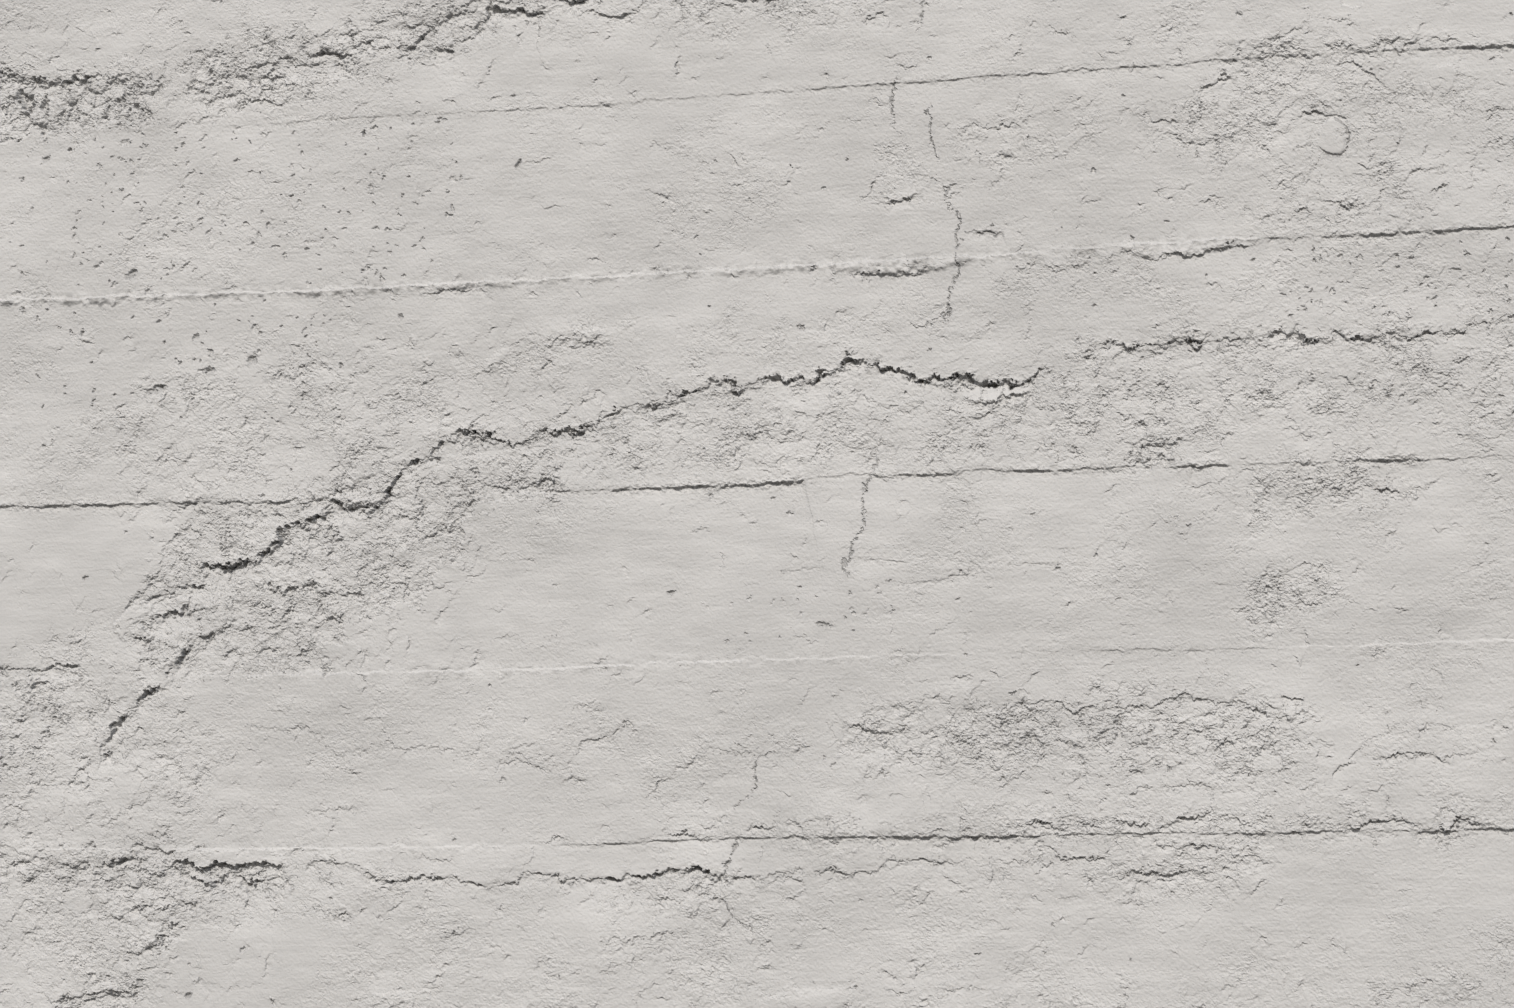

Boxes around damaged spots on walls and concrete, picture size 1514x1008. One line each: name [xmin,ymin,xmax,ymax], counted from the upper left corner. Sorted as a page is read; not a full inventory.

spalling [0,0,651,151]
spalling [674,0,836,32]
peeling [861,11,889,26]
crack [17,313,1514,814]